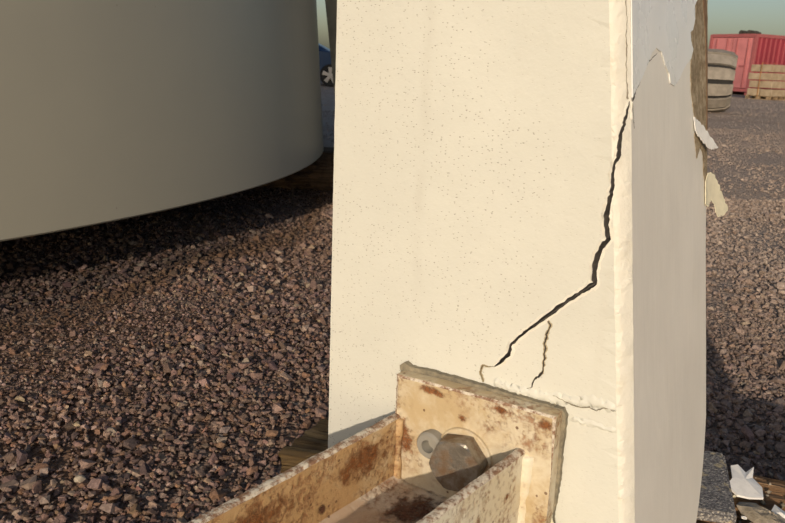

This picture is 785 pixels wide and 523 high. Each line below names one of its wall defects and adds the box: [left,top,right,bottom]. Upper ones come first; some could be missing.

peeling [631,0,728,217]
crack [479,0,639,389]
corrosion [420,385,442,397]
crack [553,395,612,411]
corrosion [402,420,412,451]
corrosion [339,439,388,485]
corrosion [383,491,443,522]